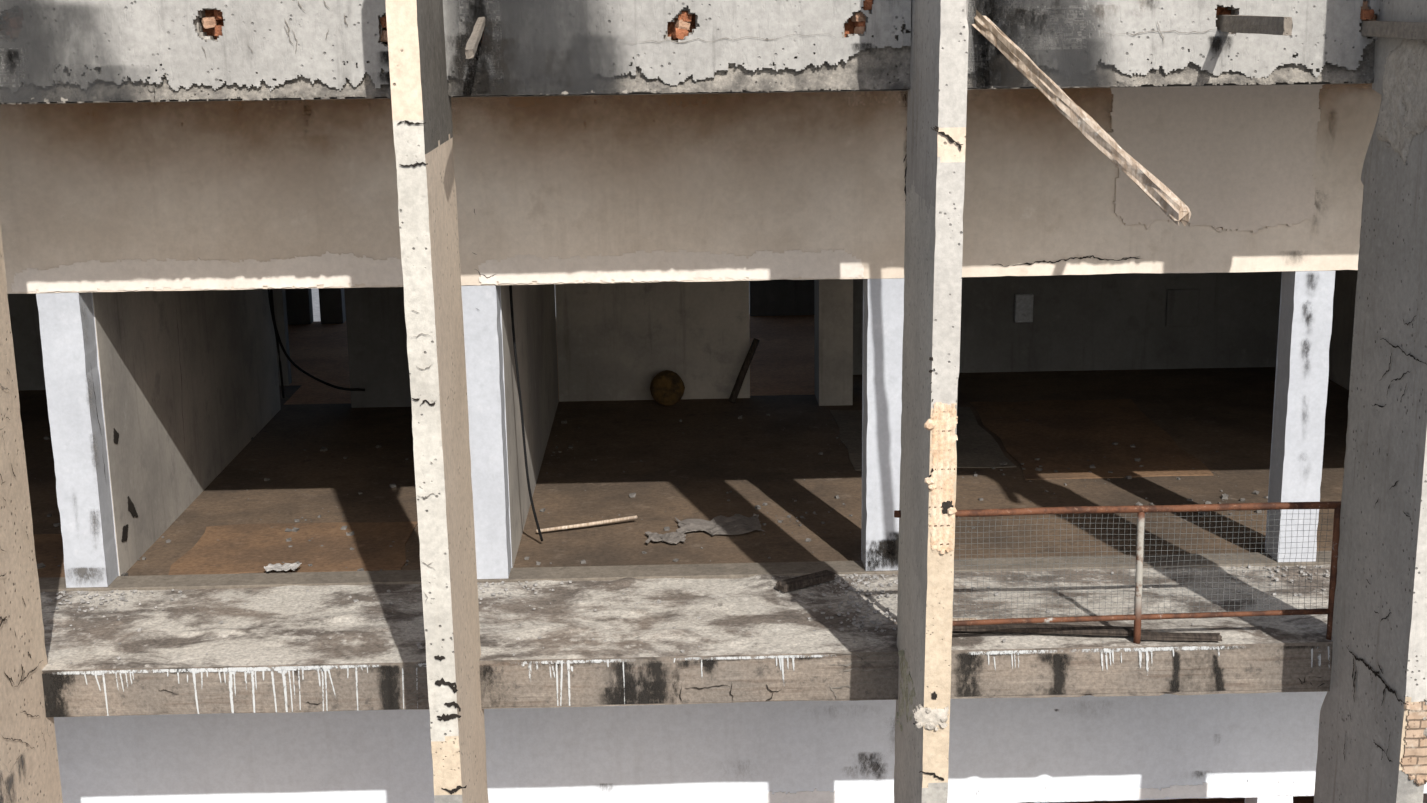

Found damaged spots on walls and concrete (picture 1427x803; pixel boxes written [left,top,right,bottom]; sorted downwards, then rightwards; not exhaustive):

water stain [0,0,107,103]
spalling [552,0,911,95]
crack [903,126,963,201]
crack [994,255,1140,266]
spalling [924,402,958,554]
water stain [42,663,427,717]
water stain [523,655,822,706]
water stain [956,646,1238,711]
water stain [1286,646,1330,667]
crack [1299,649,1408,762]
spalling [1400,698,1427,786]